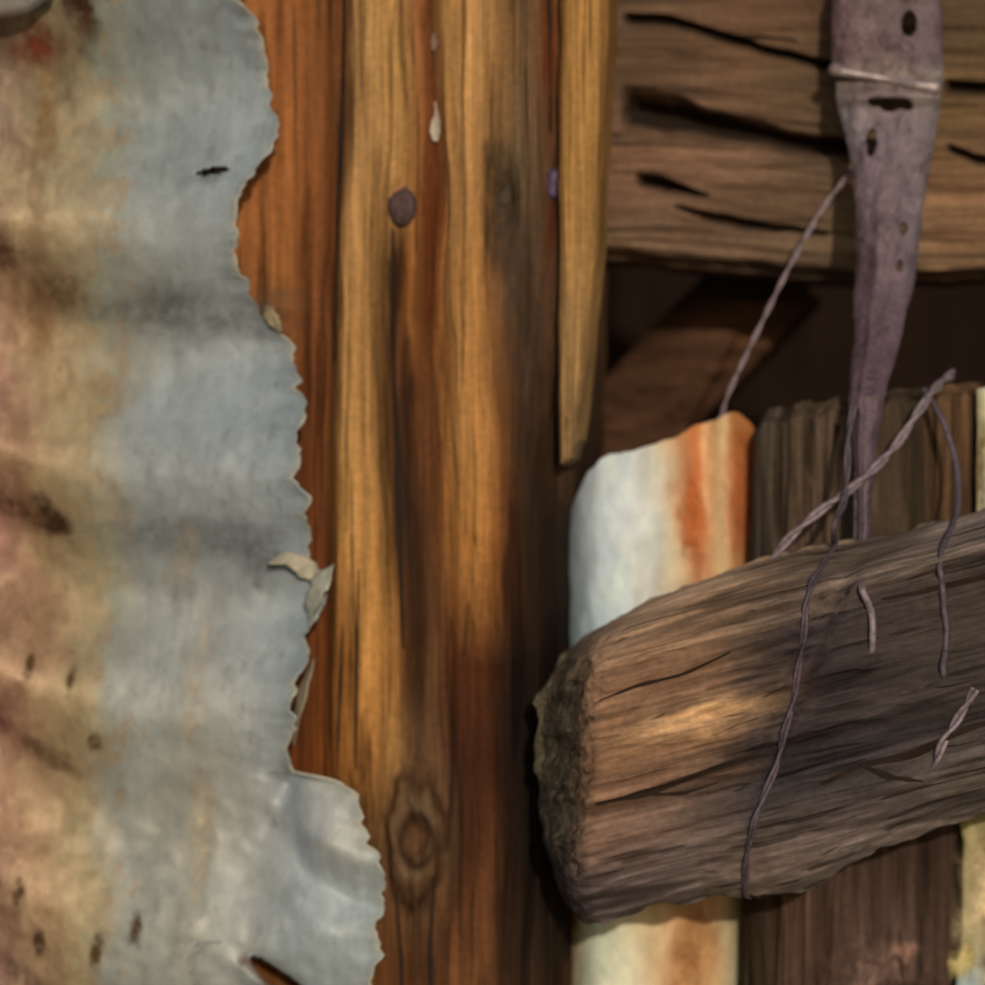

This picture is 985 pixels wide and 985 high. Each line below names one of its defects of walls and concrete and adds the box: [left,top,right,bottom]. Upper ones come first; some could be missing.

crack [627,16,832,70]
crack [948,82,985,92]
crack [628,99,849,156]
crack [950,146,985,164]
crack [642,178,828,235]
rust [732,444,752,527]
rust [679,481,705,556]
rust [34,931,44,953]
rust [90,935,102,963]
rust [131,917,141,941]